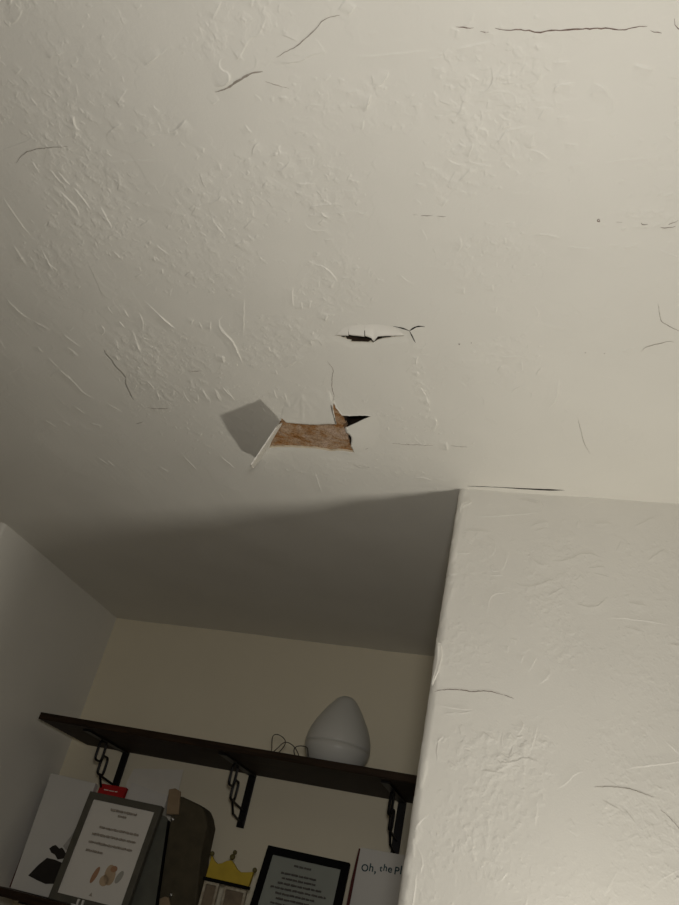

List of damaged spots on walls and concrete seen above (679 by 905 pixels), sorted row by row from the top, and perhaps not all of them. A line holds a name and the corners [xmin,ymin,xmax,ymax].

crack [459,19,679,33]
peeling [281,386,380,453]